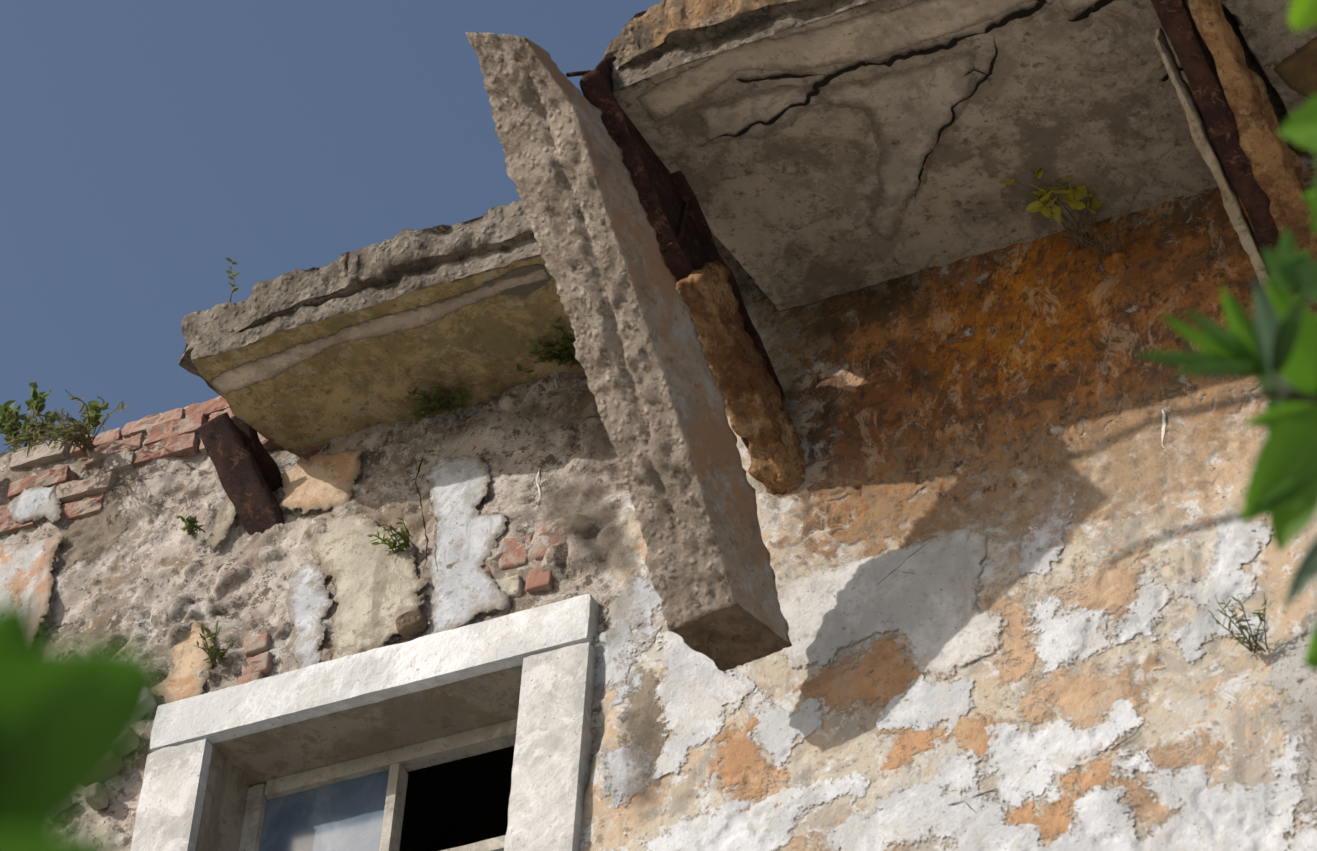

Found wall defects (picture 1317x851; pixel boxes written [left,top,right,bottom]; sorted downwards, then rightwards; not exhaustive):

crack [704,0,1114,204]
spalling [51,487,129,575]
peeling [591,477,1317,851]
rust [770,187,1265,566]